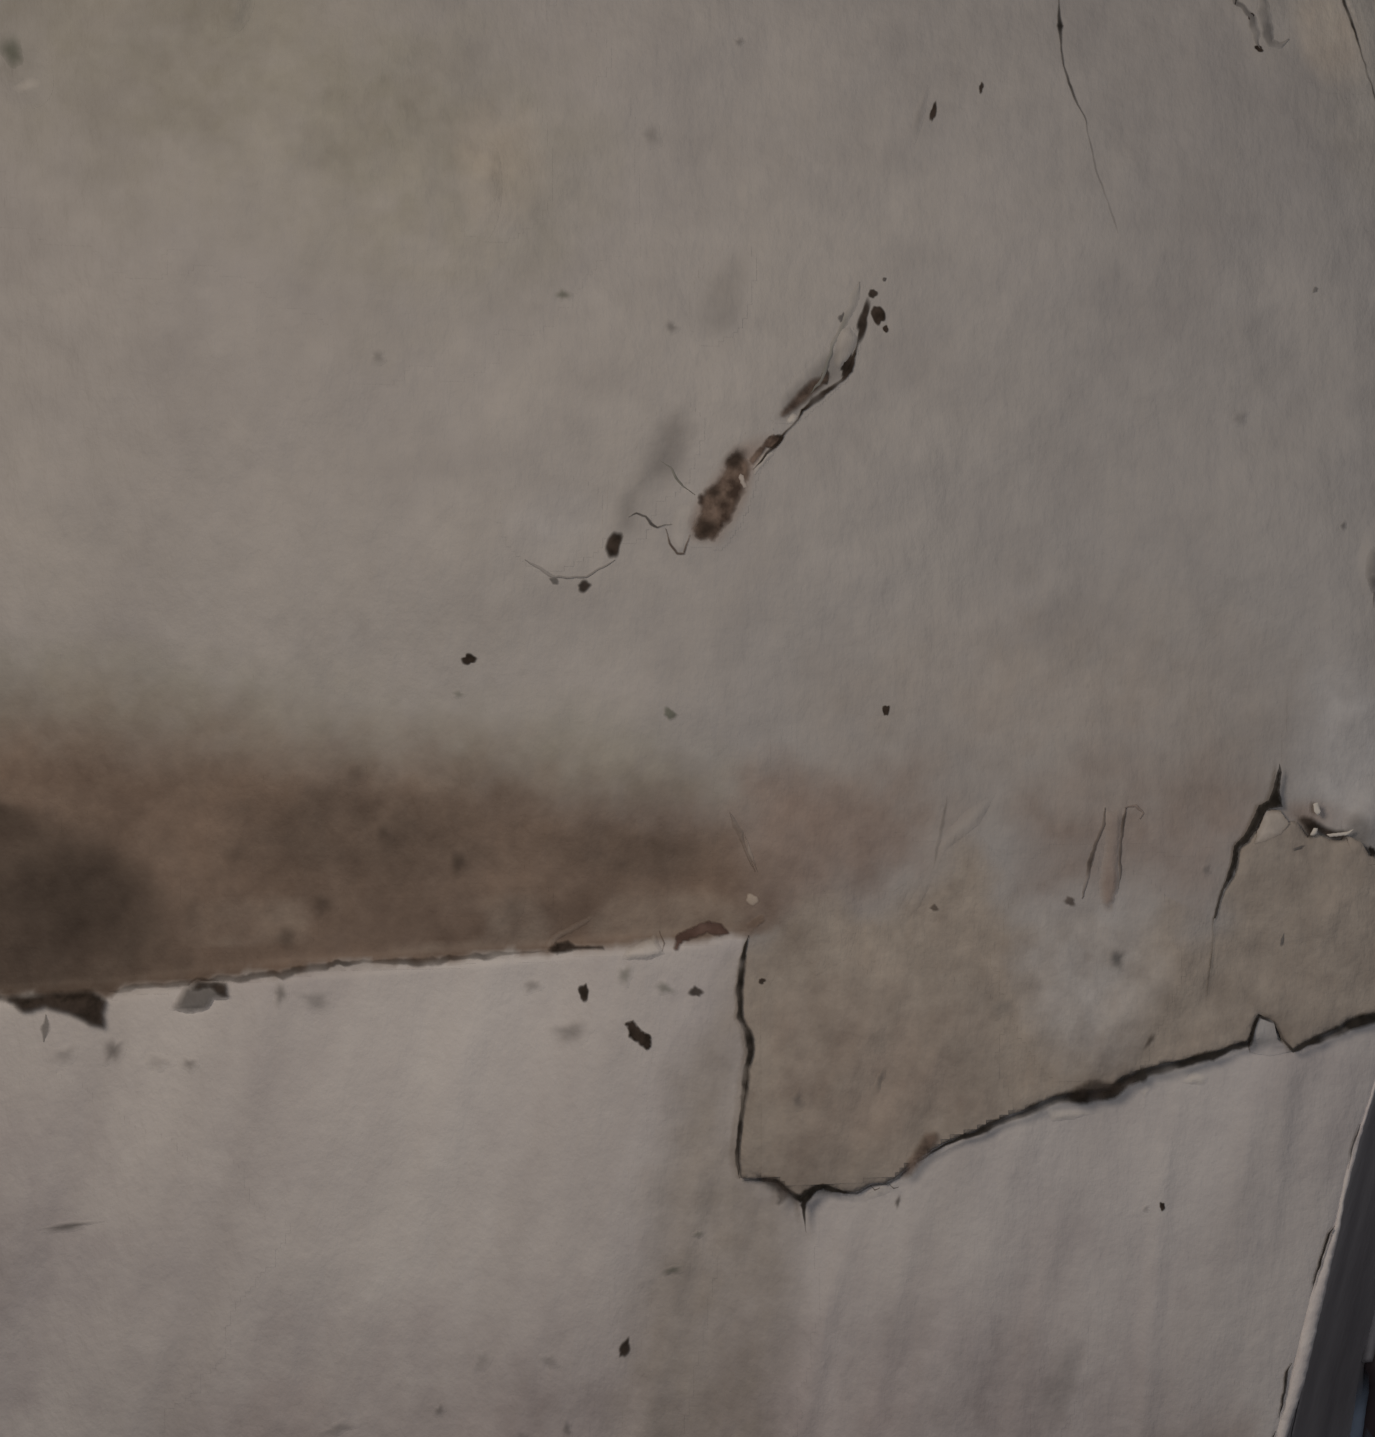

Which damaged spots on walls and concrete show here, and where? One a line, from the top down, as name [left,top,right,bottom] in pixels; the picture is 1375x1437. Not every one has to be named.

crack [1057,8,1073,92]
crack [1342,0,1363,44]
peeling [542,984,595,1048]
flaking render [543,913,602,953]
peeling [625,1021,651,1049]
flaking render [614,921,728,988]
peeling [651,979,702,996]
water stain [0,530,1375,1437]
flaking render [739,793,1375,1196]